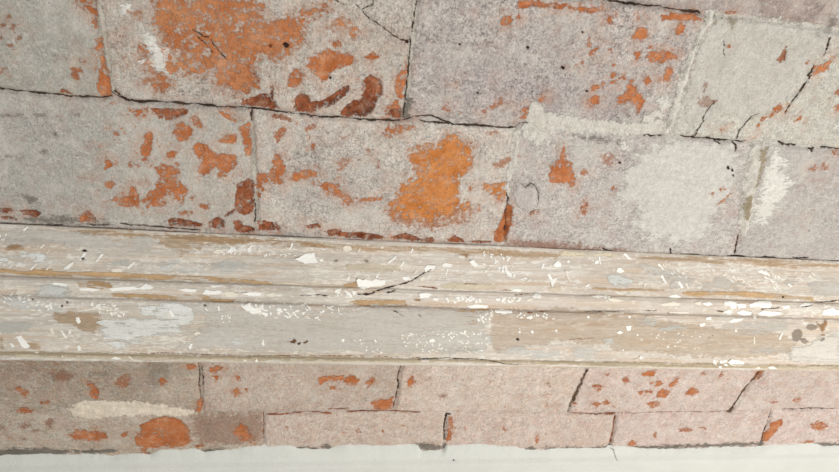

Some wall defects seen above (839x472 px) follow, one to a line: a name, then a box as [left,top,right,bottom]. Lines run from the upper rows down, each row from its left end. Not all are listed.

peeling [127,0,359,142]
crack [0,0,528,128]
peeling [288,40,383,117]
crack [785,37,831,113]
crack [643,102,757,152]
crack [777,141,839,152]
peeling [74,107,480,264]
peeling [0,252,343,323]
peeling [334,182,555,353]
peeling [586,262,815,332]
peeling [121,416,205,454]
crack [568,370,759,461]